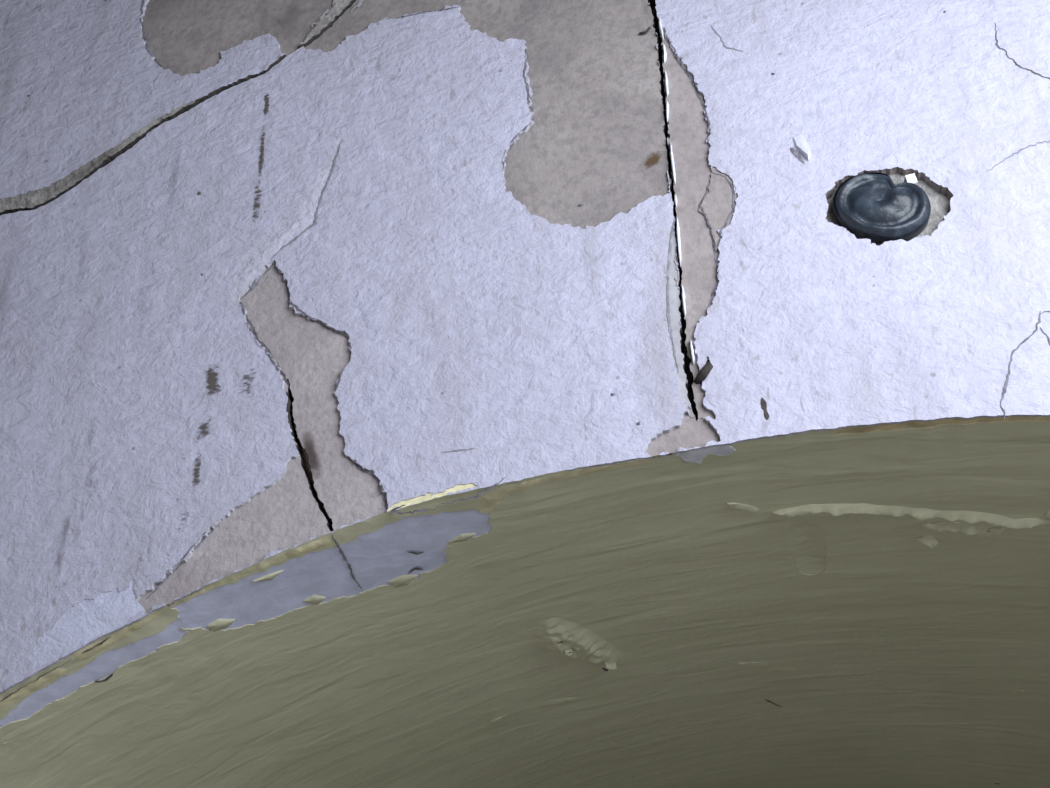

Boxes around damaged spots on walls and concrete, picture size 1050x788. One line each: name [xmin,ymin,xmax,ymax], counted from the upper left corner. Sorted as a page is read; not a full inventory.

crack [0,0,364,216]
crack [648,0,698,421]
spalling [825,167,953,242]
crack [987,141,1050,172]
crack [995,23,1050,79]
crack [240,302,363,591]
flaking render [0,0,738,728]
crack [1000,310,1050,419]